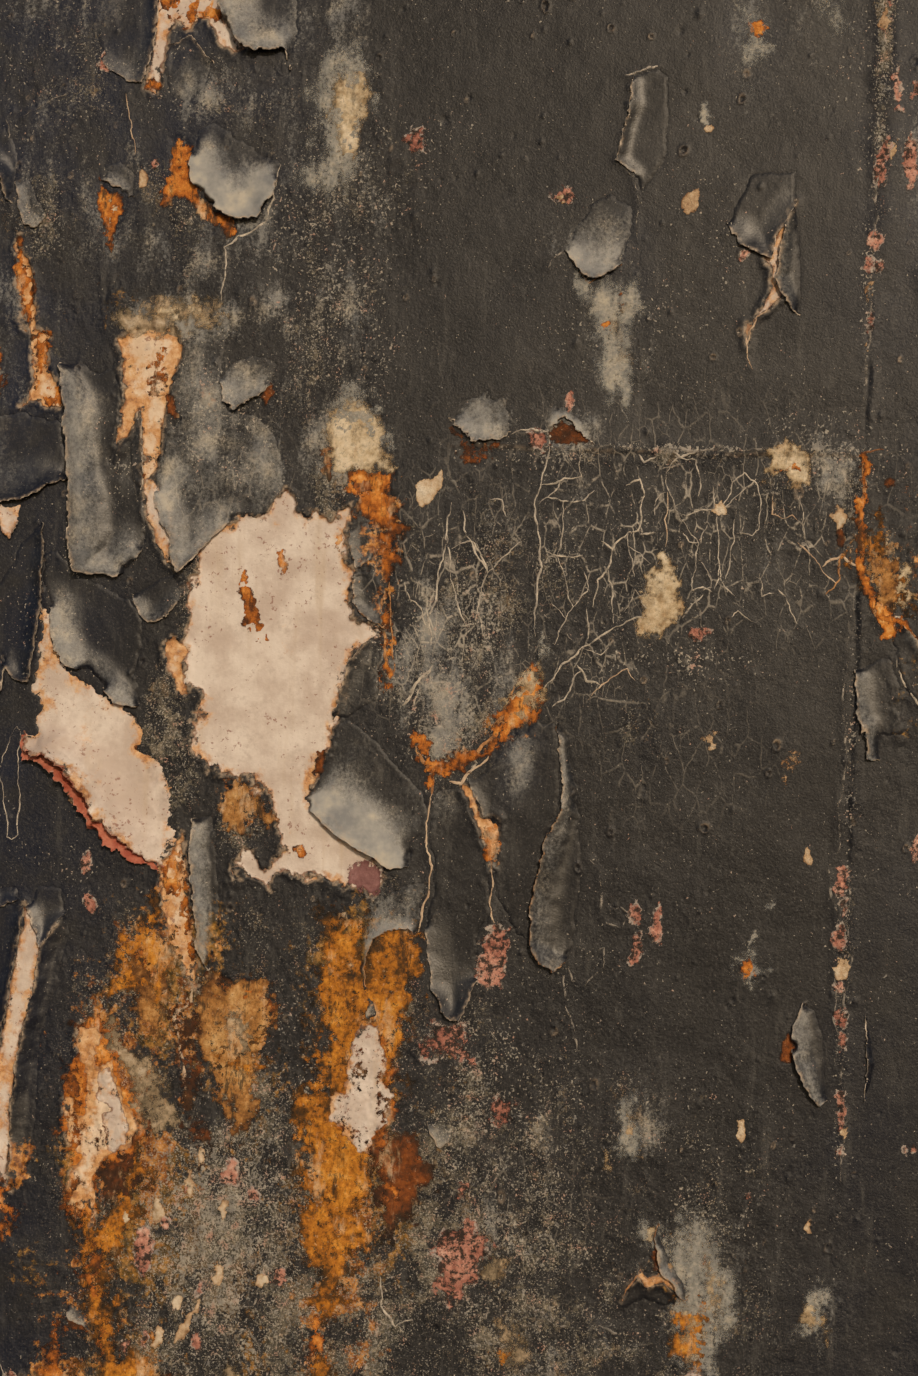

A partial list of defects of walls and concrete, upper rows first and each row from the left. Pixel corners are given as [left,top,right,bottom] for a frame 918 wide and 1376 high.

peeling [91,0,298,101]
peeling [0,127,46,228]
peeling [138,123,281,300]
crack [402,427,837,707]
rust [822,449,918,705]
peeling [0,327,595,1278]
rust [410,655,547,794]
rust [92,889,441,1376]
efflorescence [604,1094,644,1169]
rust [25,1112,173,1376]
peeling [119,1261,224,1355]
damp [485,1317,536,1376]